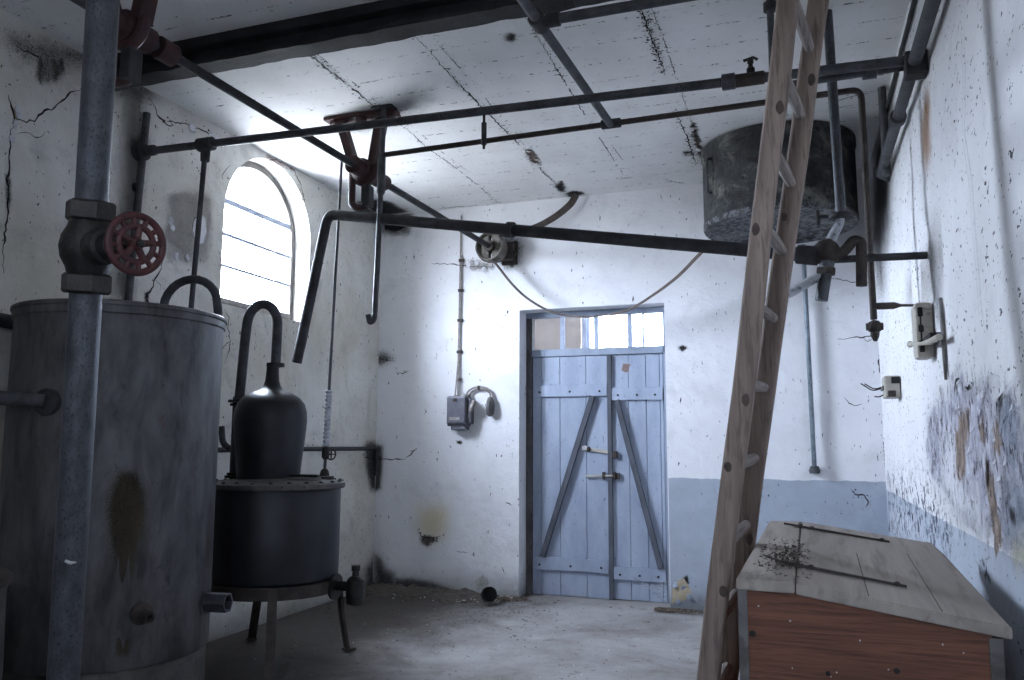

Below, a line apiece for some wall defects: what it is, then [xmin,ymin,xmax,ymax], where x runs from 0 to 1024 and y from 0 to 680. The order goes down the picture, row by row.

mould [0,24,83,86]
crack [2,88,81,274]
crack [148,97,227,177]
crack [404,124,501,209]
crack [419,35,566,199]
mould [363,439,384,495]
peeling [886,349,1024,596]